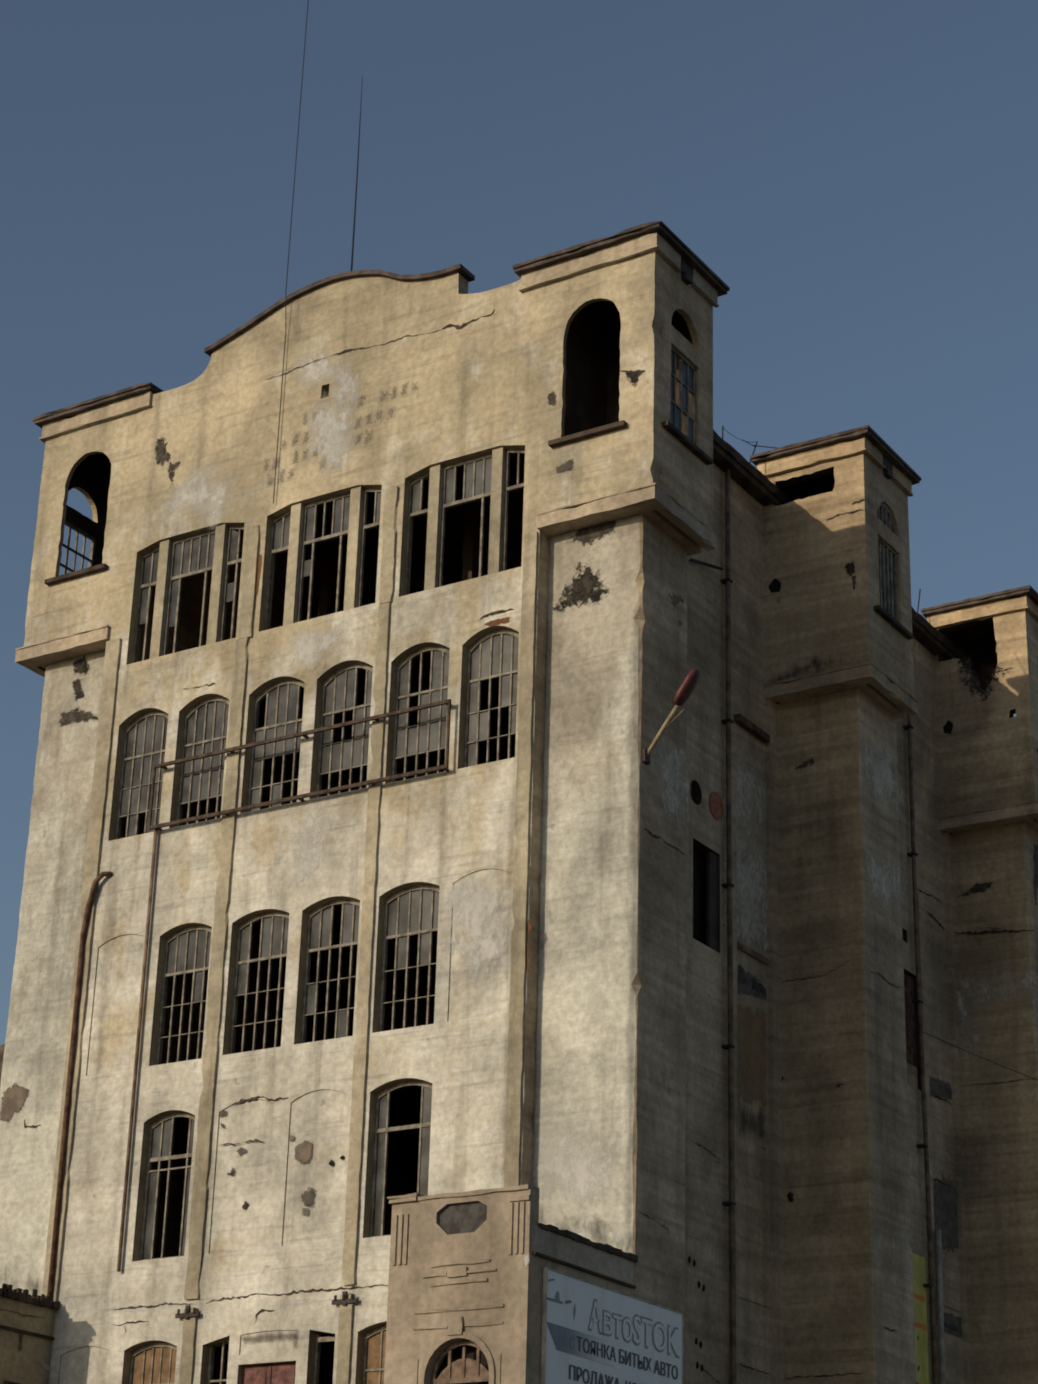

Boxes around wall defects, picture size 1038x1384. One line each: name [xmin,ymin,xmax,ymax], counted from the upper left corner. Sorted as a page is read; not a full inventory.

crack [269,310,494,379]
peeling [155,437,180,482]
peeling [567,520,616,546]
peeling [553,562,609,612]
peeling [0,1083,40,1128]
peeling [288,1135,312,1164]
peeling [299,1187,316,1216]
crack [107,1284,387,1332]